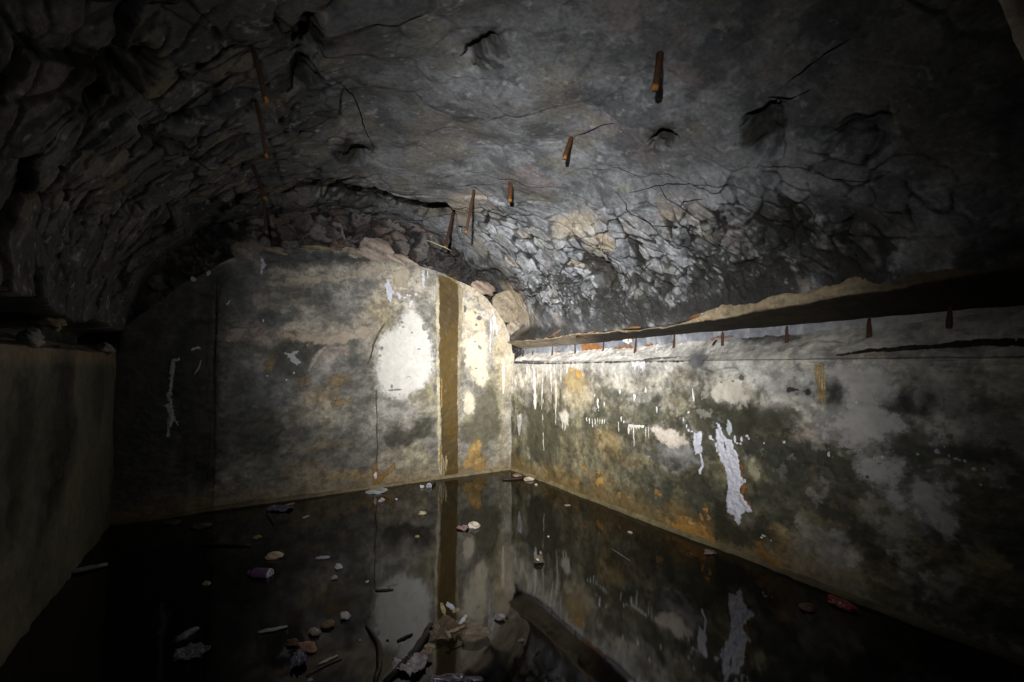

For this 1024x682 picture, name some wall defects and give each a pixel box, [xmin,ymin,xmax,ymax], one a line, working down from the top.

crack [768,39,849,100]
crack [600,183,709,288]
crack [836,338,1024,357]
corrosion [435,276,487,476]
damp [383,418,432,447]
damp [517,364,568,463]
spalling [559,409,569,431]
damp [618,416,649,439]
spalling [650,426,693,460]
damp [683,388,794,549]
peeling [740,457,761,508]
corrosion [669,507,717,543]